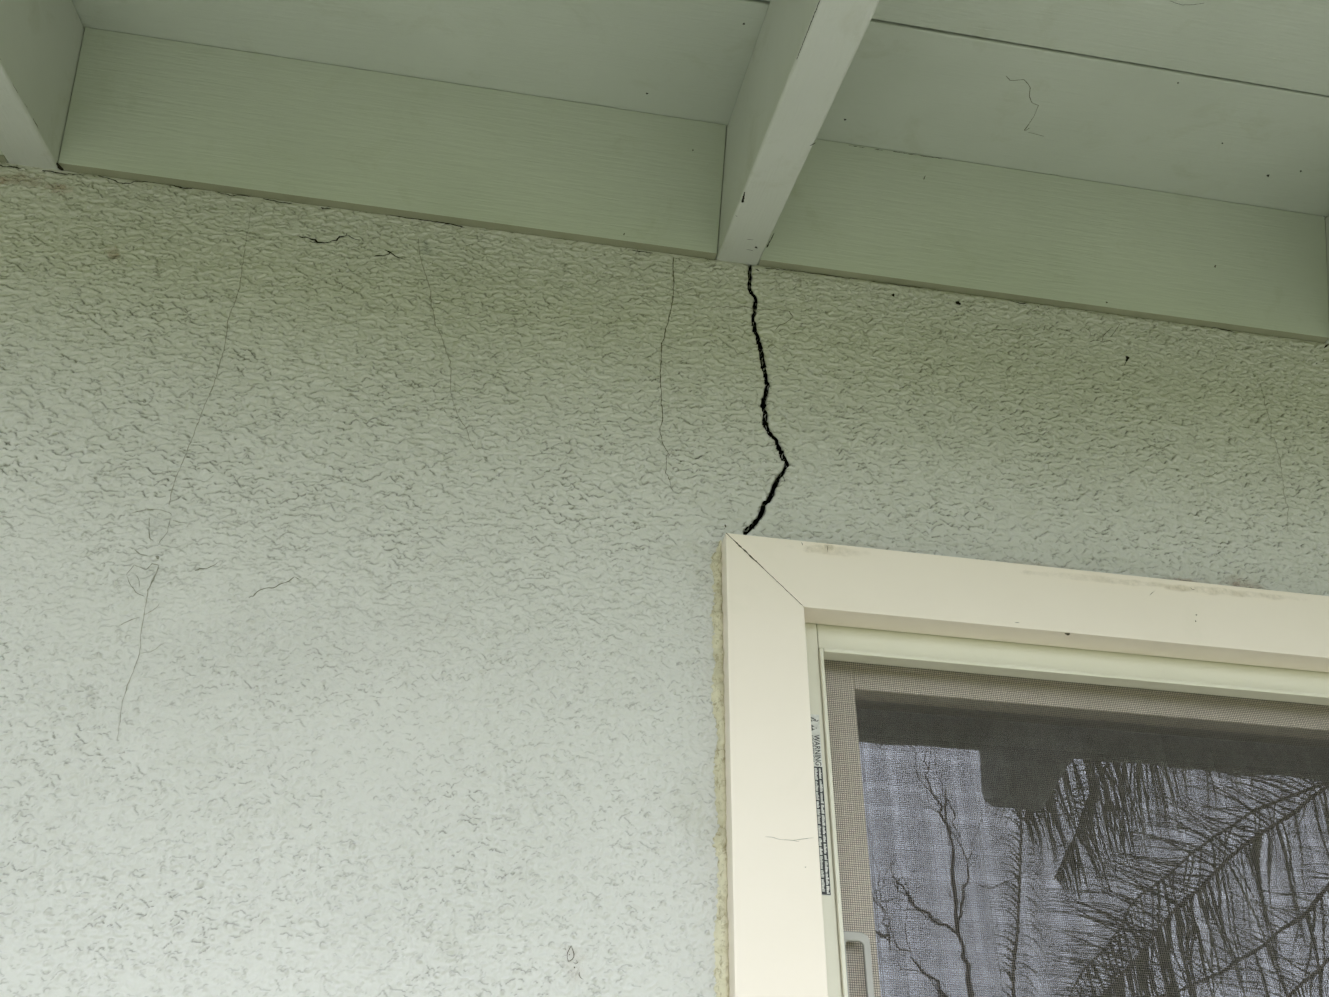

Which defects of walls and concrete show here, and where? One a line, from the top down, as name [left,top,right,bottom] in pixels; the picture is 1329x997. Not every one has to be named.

crack [657,257,676,491]
crack [712,234,793,535]